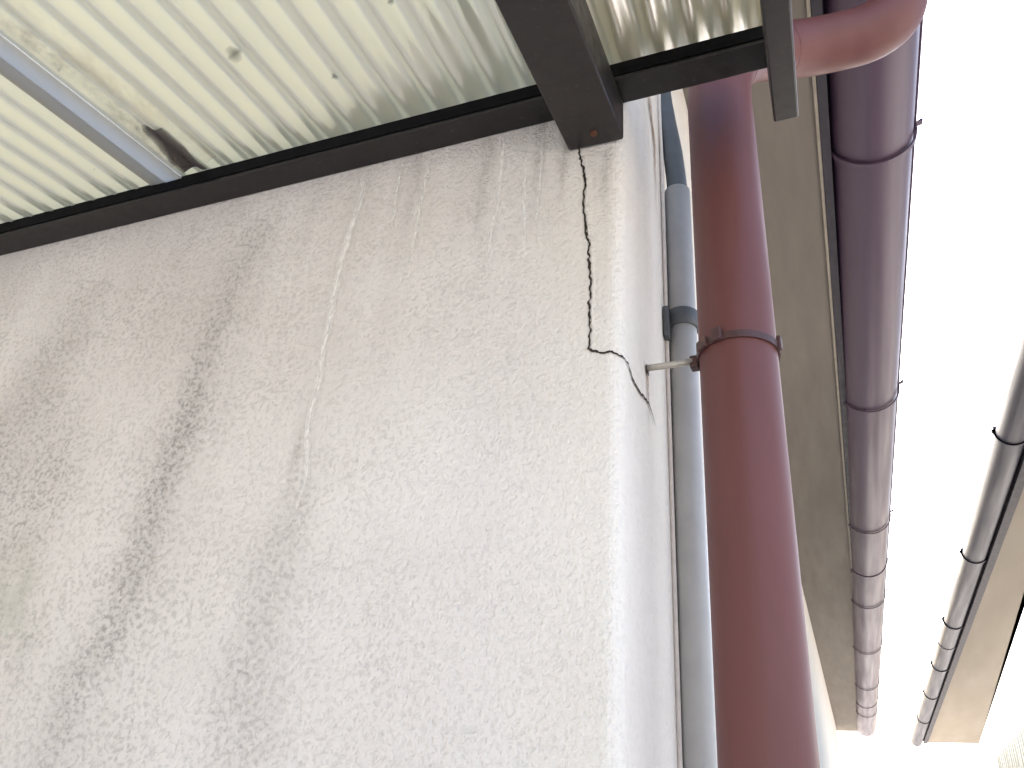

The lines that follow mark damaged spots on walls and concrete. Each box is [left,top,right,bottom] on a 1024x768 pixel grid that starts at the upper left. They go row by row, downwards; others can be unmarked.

crack [578,148,656,425]